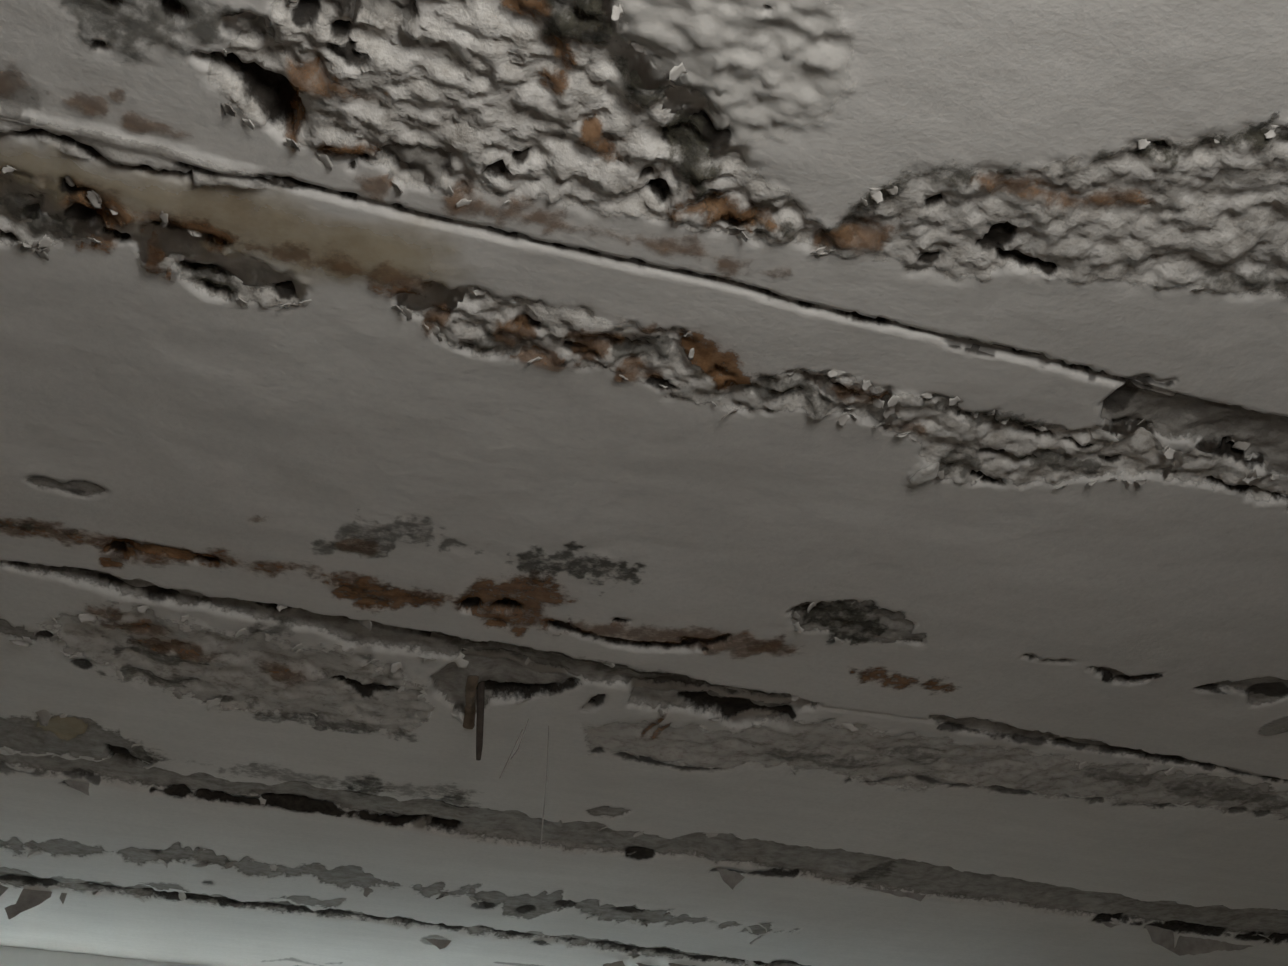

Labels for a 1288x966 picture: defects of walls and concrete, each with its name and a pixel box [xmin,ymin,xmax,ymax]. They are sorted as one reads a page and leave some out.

flaking render [207,0,835,256]
leakage [0,155,426,288]
peeling [27,476,105,496]
rust [0,519,237,569]
rust [253,561,575,636]
flaking render [791,599,926,644]
flaking render [0,710,156,769]
flaking render [0,603,580,735]
flaking render [628,678,800,740]
peeling [1090,666,1162,682]
peeling [1197,676,1288,705]
peeling [0,837,792,944]